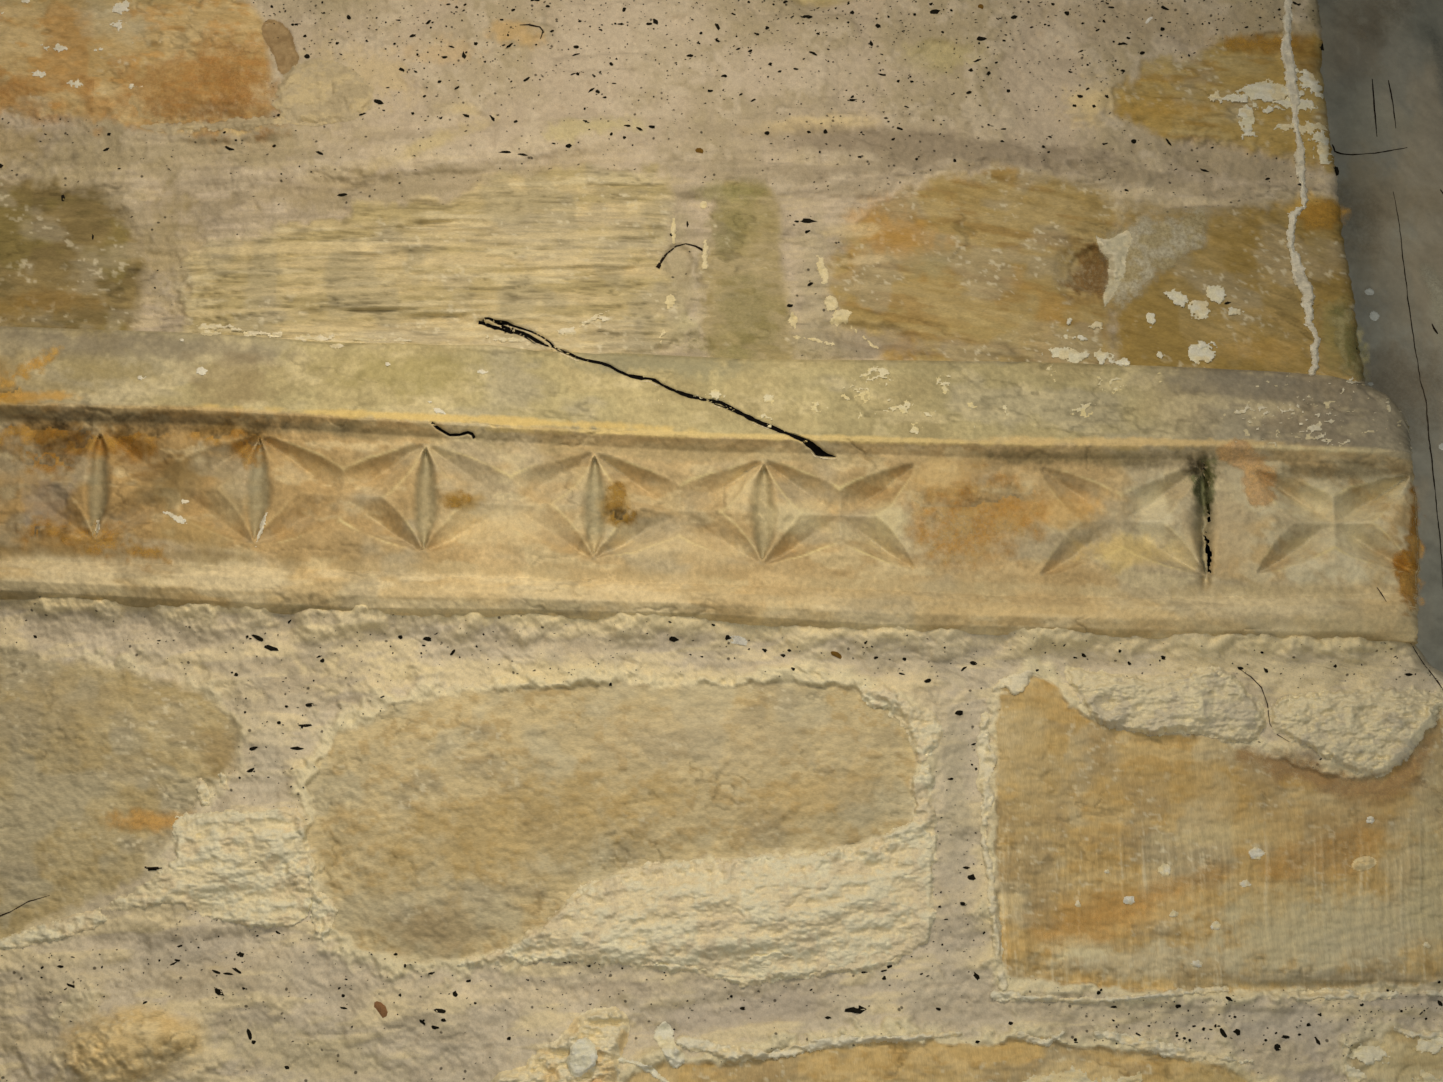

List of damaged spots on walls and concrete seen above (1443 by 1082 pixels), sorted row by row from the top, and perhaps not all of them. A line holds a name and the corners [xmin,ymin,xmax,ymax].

crack [478,317,836,459]
water stain [1208,0,1411,448]